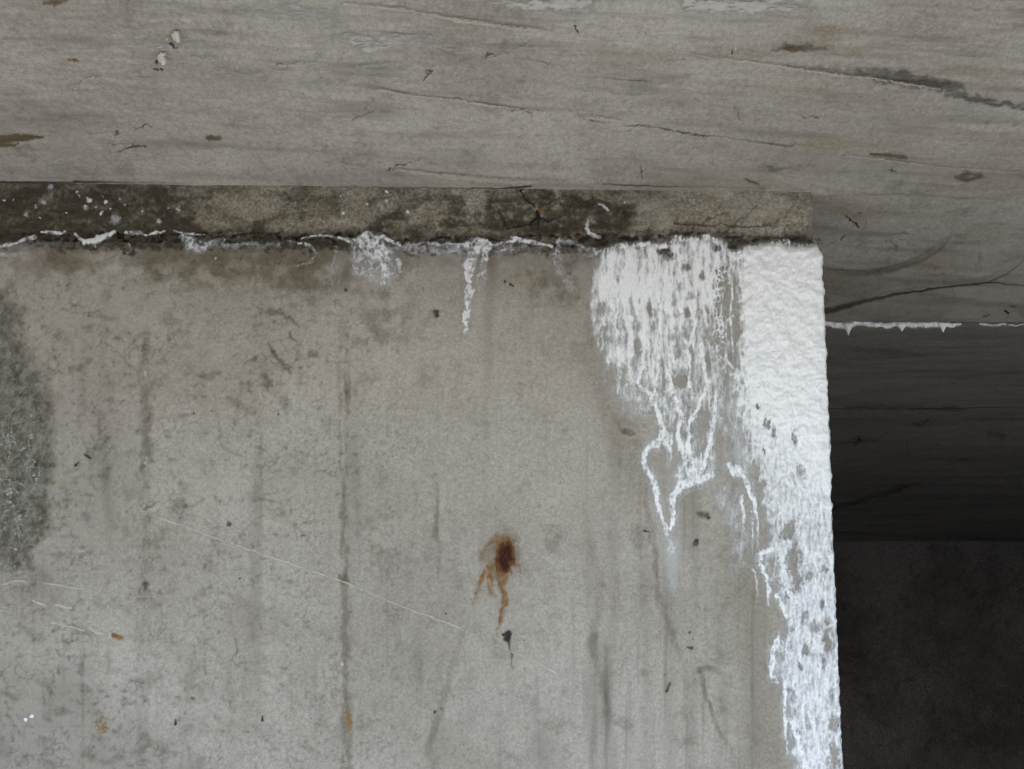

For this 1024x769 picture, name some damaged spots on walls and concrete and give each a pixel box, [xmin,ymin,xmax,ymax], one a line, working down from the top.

damp [180,232,225,274]
crack [0,185,820,245]
damp [279,231,569,334]
crack [824,234,1017,315]
damp [582,220,961,769]
corrosion [475,537,515,624]